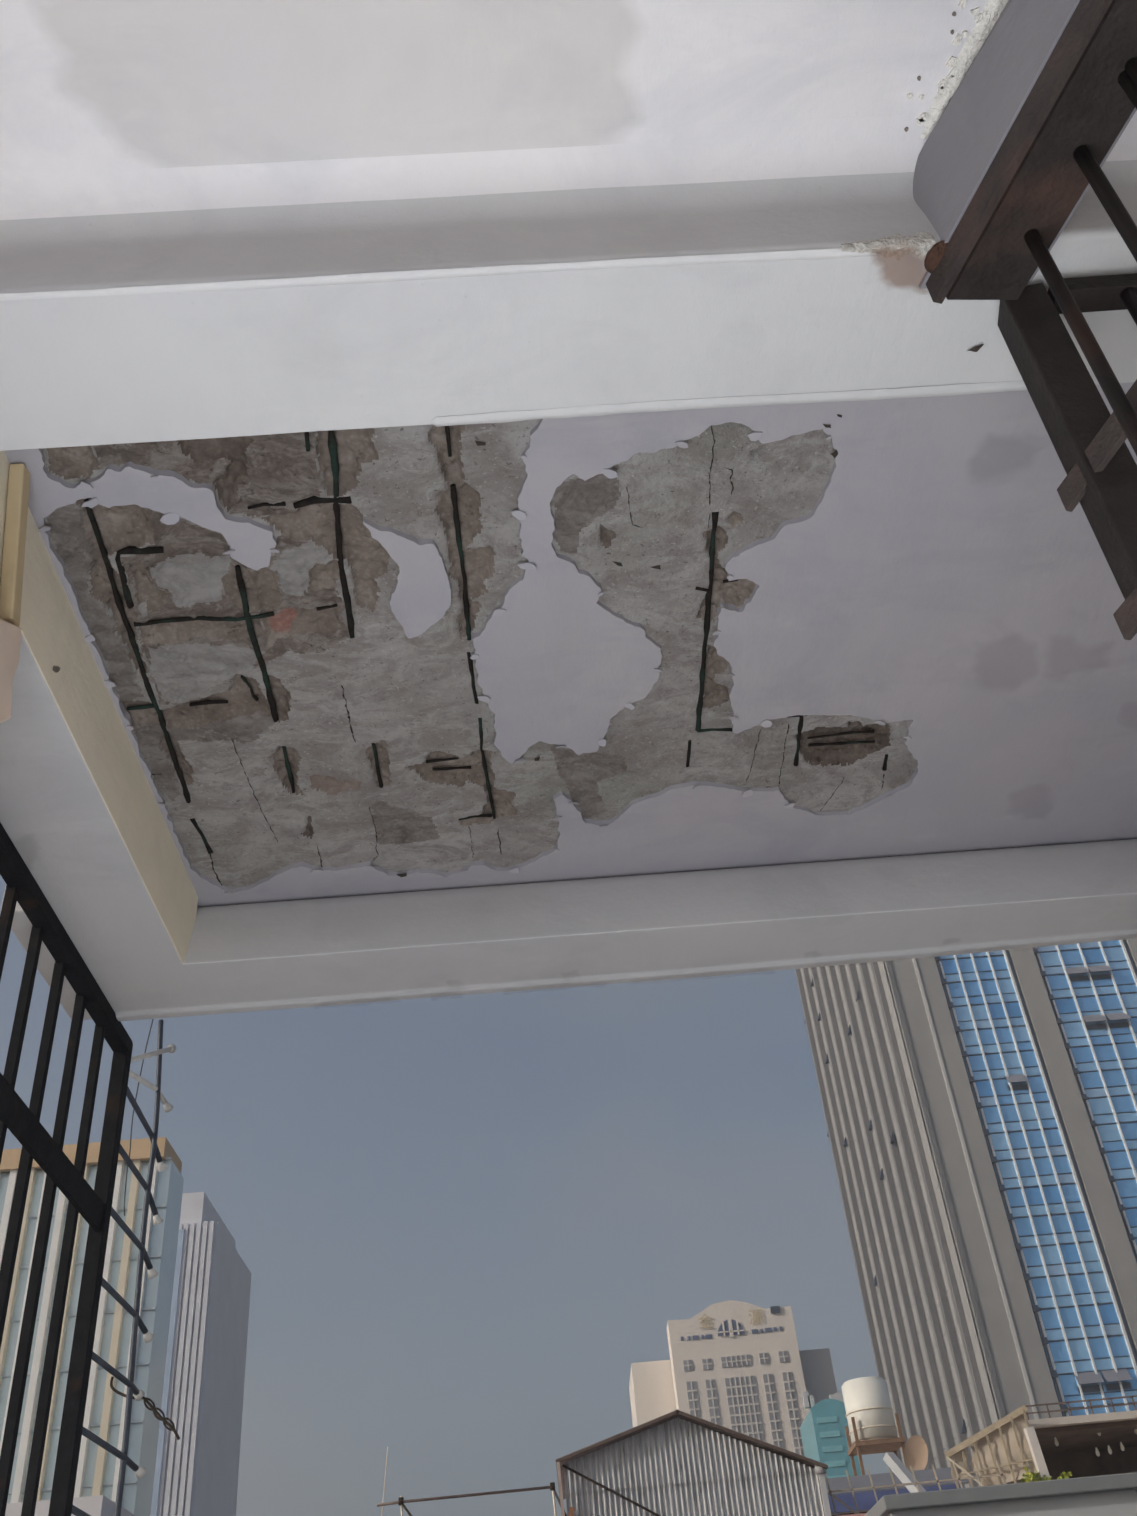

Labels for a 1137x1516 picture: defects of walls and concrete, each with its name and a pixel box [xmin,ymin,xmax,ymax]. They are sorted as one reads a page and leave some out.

spalling [904,0,1009,139]
spalling [38,414,917,893]